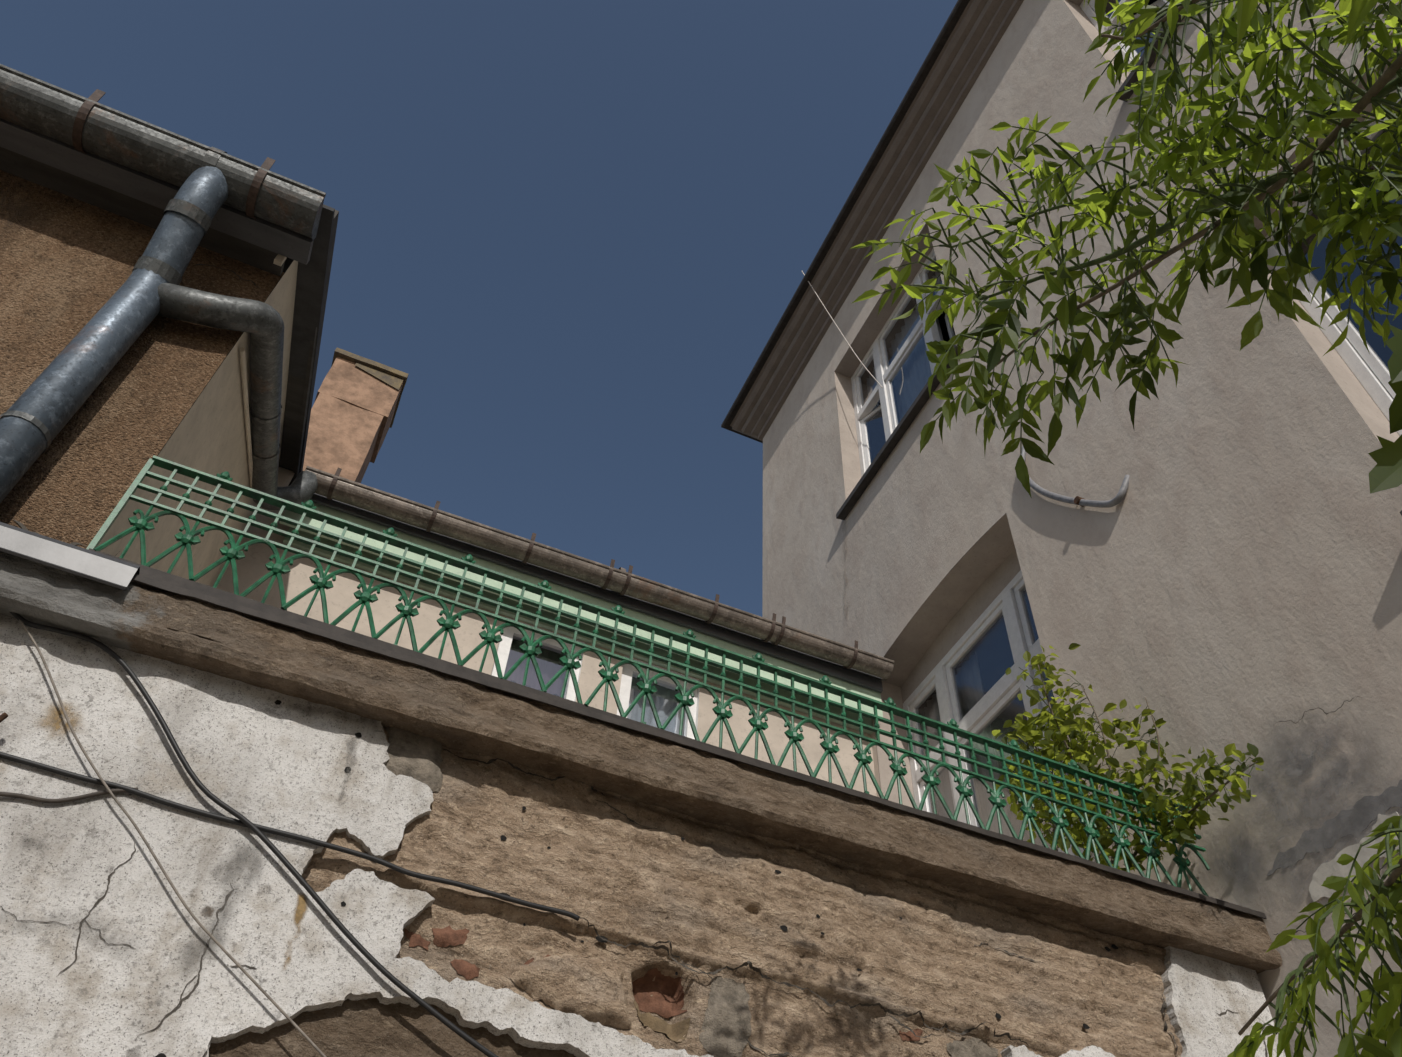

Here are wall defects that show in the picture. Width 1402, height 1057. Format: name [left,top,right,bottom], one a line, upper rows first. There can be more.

crack [1275,696,1362,724]
crack [1,842,136,975]
crack [136,883,257,1039]
spalling [188,998,576,1057]
spalling [299,746,1183,1057]
peeling [1267,780,1402,902]